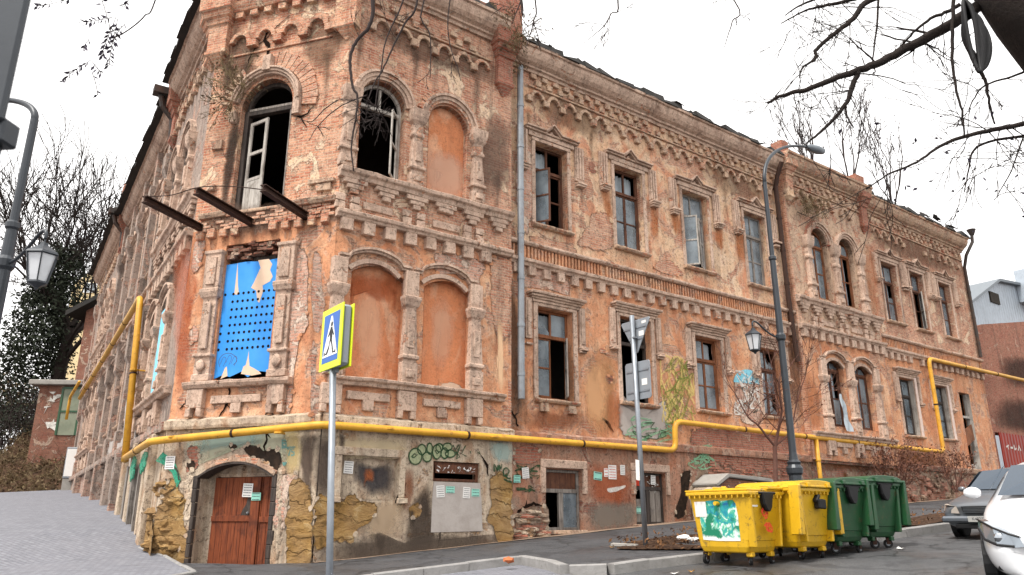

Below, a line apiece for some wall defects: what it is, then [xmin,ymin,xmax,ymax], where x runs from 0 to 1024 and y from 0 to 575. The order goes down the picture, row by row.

flaking render [140,444,201,563]
damp [189,432,402,494]
flaking render [229,442,378,564]
flaking render [487,444,551,543]